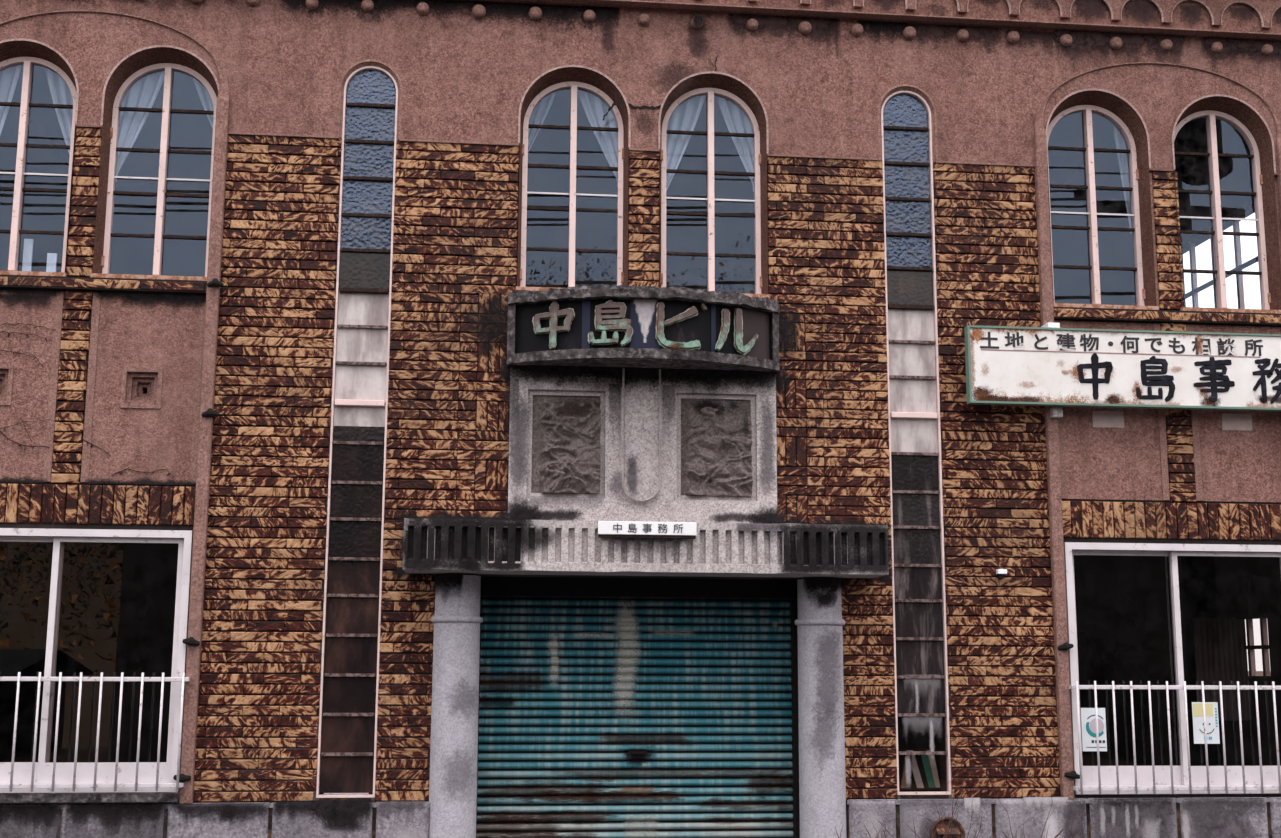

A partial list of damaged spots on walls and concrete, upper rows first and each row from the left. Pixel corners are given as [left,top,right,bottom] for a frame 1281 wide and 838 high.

damp [688,21,709,56]
corrosion [1179,331,1227,353]
corrosion [966,326,1086,406]
corrosion [1106,382,1142,404]
corrosion [1197,387,1220,406]
corrosion [1246,395,1281,410]
corrosion [601,733,686,745]
corrosion [701,776,793,823]
corrosion [478,784,683,838]